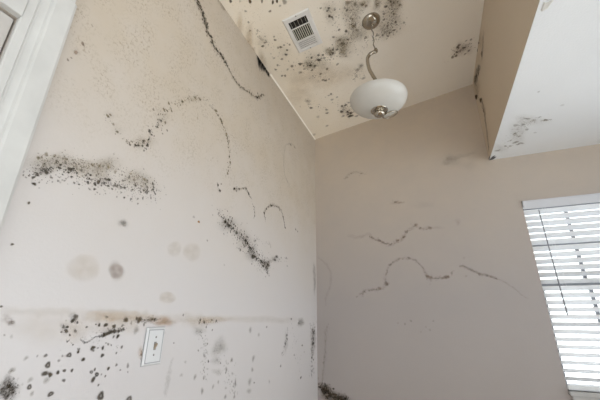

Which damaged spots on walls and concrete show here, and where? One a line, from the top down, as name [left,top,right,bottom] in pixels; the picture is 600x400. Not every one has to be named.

crack [257,56,269,76]
mould [23,158,157,201]
mould [217,209,278,274]
leakage [91,323,124,357]